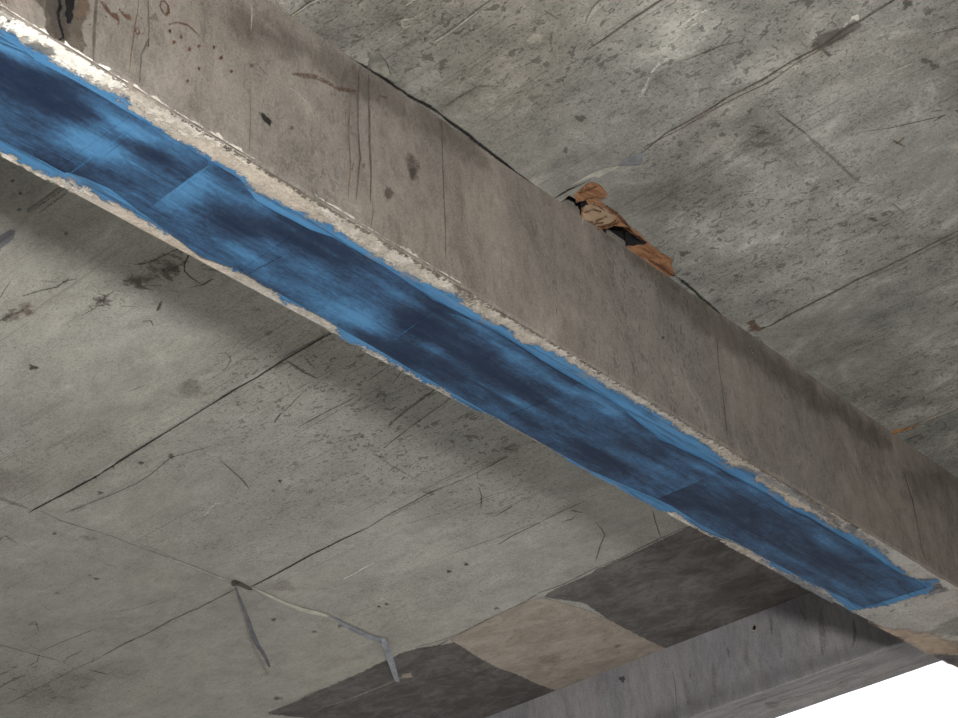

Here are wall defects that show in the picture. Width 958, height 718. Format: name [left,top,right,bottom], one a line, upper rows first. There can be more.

peeling [0,14,128,90]
spalling [0,28,939,611]